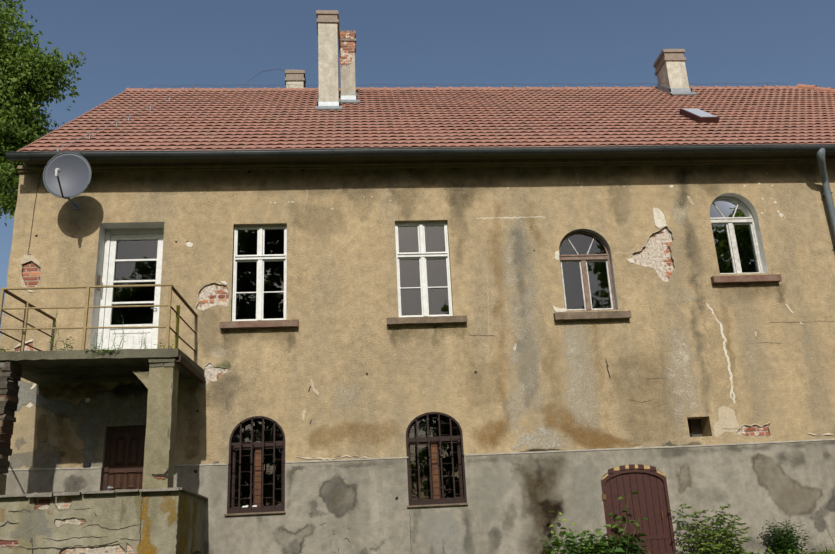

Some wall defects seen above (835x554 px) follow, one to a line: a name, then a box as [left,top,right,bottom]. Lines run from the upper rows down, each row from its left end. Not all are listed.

spalling [20,254,42,293]
spalling [194,273,230,312]
spalling [627,208,676,283]
spalling [197,361,229,388]
crack [706,303,735,404]
damp [8,438,64,469]
damp [17,381,148,467]
crack [151,371,173,479]
damp [512,325,615,554]
crack [0,495,143,554]
spalling [58,541,138,554]
damp [319,479,355,517]